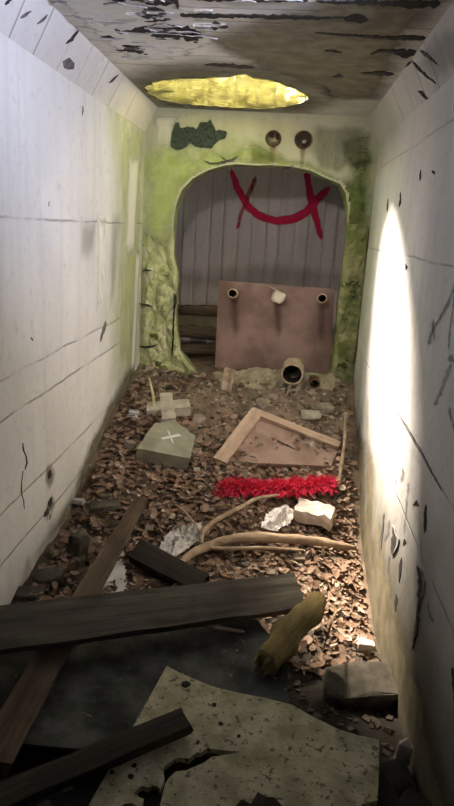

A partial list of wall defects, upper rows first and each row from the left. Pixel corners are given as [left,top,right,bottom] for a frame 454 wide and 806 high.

peeling [52,0,228,60]
spalling [343,14,368,24]
spalling [370,48,416,58]
damp [315,129,359,169]
crack [20,443,28,509]